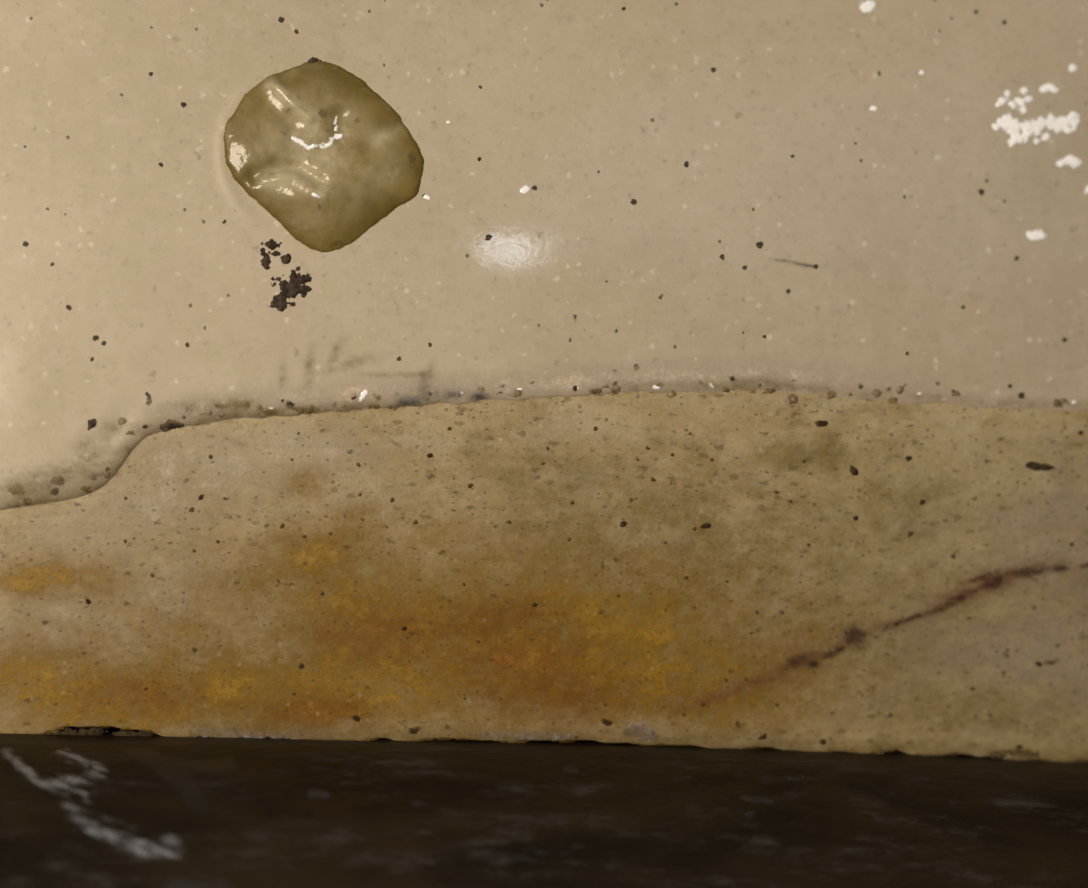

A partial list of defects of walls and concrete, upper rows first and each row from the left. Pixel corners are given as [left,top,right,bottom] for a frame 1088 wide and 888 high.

spalling [1025,461,1056,471]
rust [0,561,98,593]
peeling [601,702,659,742]
peeling [43,728,155,736]
peeling [192,727,328,739]
peeling [475,731,579,740]
peeling [989,745,1039,758]